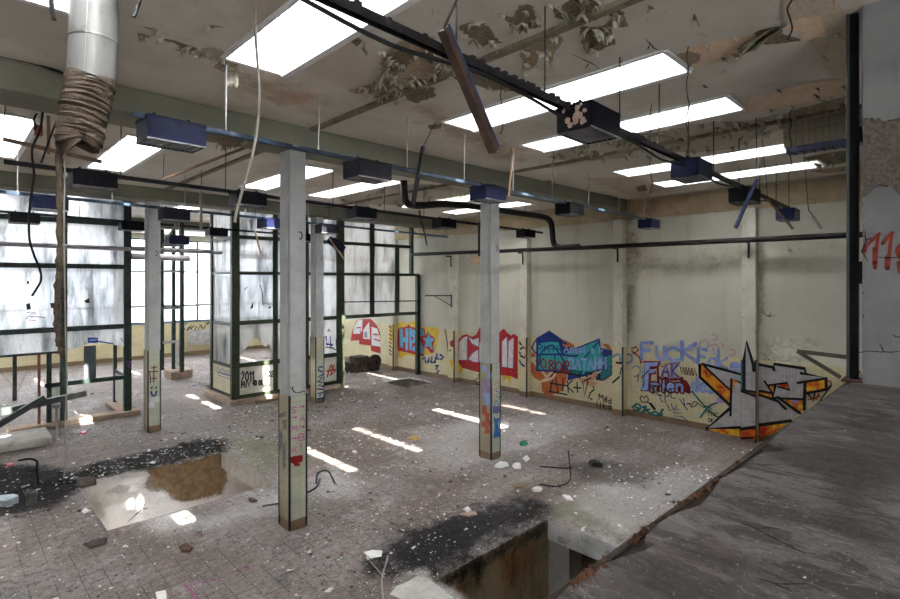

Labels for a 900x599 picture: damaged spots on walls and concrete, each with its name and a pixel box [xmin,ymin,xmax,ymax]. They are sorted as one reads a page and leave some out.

peeling [138,26,240,89]
peeling [349,38,457,106]
peeling [470,72,514,93]
peeling [520,35,564,78]
peeling [459,0,628,59]
peeling [552,0,846,162]
flaking render [862,117,900,210]